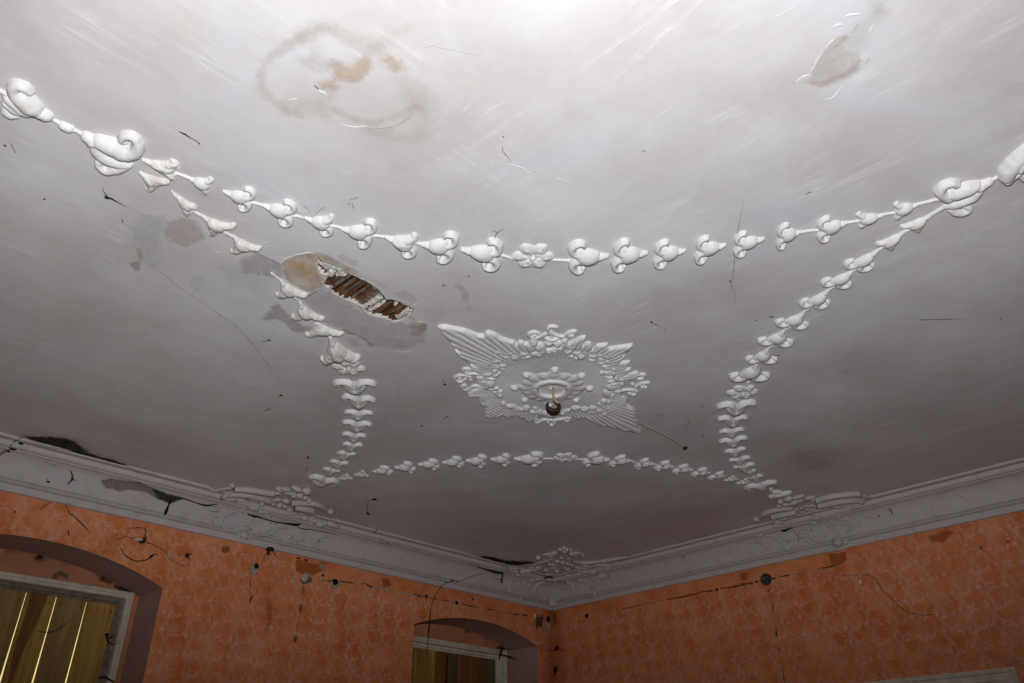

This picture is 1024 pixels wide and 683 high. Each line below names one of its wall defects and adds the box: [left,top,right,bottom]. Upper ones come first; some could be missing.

leakage [314,61,369,97]
flaking render [259,240,426,352]
crack [64,472,89,532]
crack [164,498,217,516]
crack [247,513,338,535]